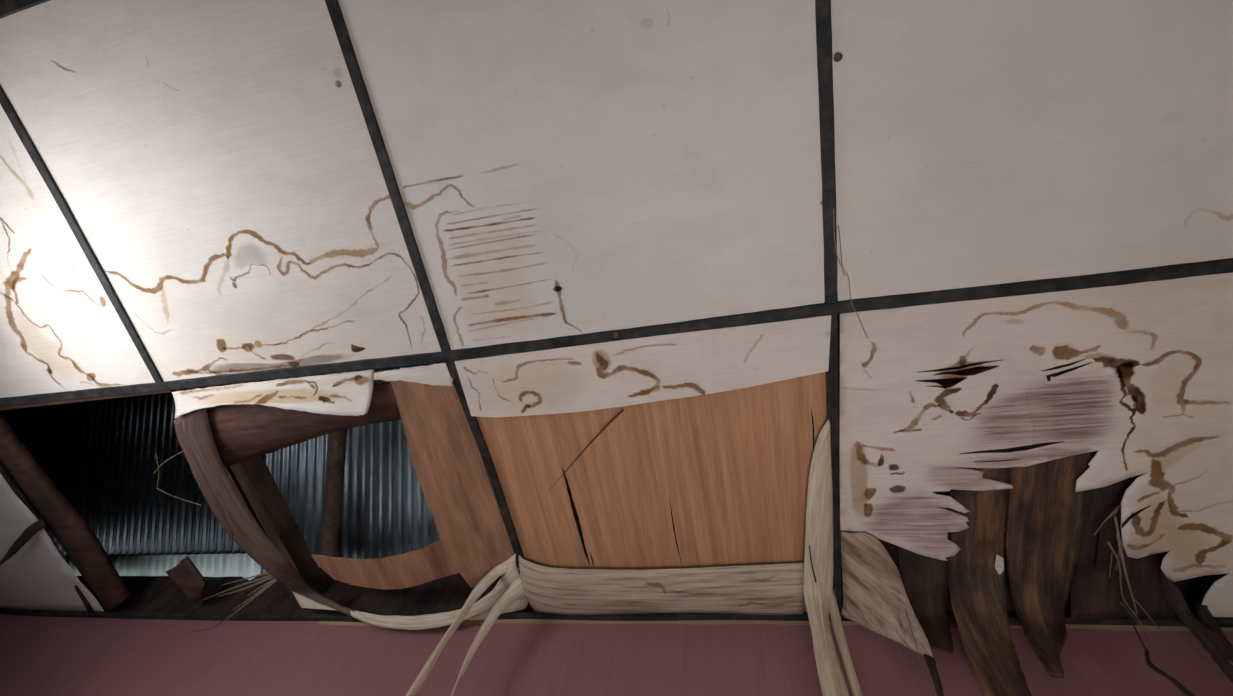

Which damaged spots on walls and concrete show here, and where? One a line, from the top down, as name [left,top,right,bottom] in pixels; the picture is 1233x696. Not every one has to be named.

water stain [166,230,304,283]
water stain [273,343,299,367]
water stain [636,369,705,394]
water stain [935,375,968,416]
water stain [981,384,998,406]
water stain [1053,346,1077,359]
water stain [1094,357,1156,471]
peeling [172,363,504,630]
crack [562,468,594,566]
water stain [1151,462,1229,564]
peeling [995,555,1004,574]
peeling [841,531,944,696]